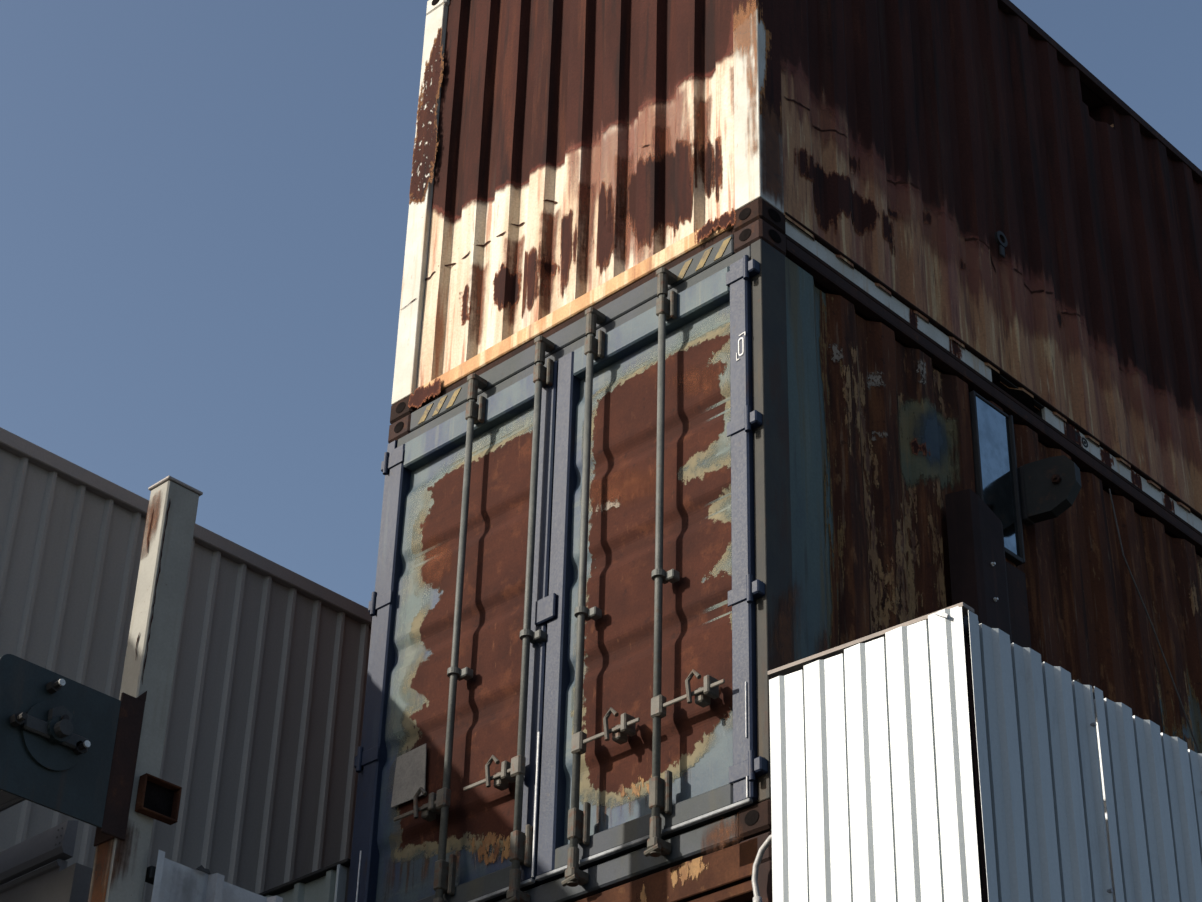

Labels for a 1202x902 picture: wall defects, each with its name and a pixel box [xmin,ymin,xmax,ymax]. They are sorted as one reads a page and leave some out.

corrosion [408,0,1202,469]
corrosion [570,322,733,831]
corrosion [770,588,796,679]
corrosion [819,290,976,653]
corrosion [1005,469,1202,751]